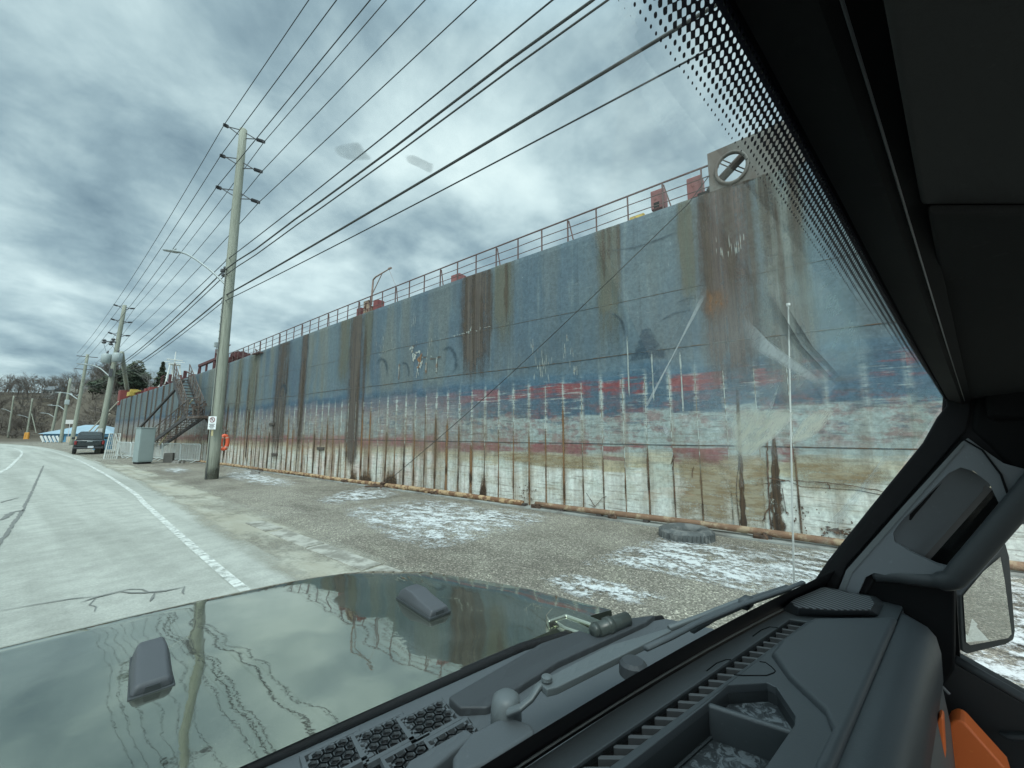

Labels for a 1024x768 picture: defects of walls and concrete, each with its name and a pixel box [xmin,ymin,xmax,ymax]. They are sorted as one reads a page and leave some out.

rust [222,311,605,509]
rust [461,262,511,375]
rust [597,224,620,329]
rust [678,164,816,389]